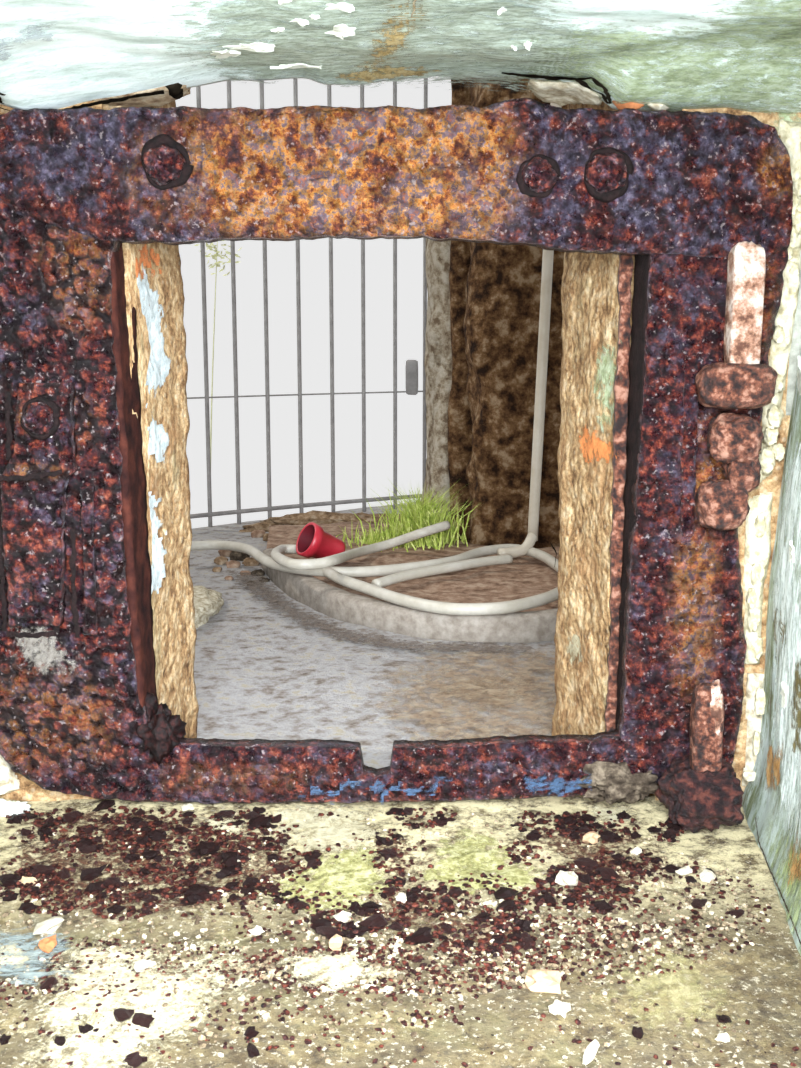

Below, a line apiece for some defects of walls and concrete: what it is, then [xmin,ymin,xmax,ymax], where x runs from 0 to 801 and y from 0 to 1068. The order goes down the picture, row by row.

crack [502,72,612,104]
damp [774,608,787,658]
damp [791,661,801,753]
corrosion [766,743,783,790]